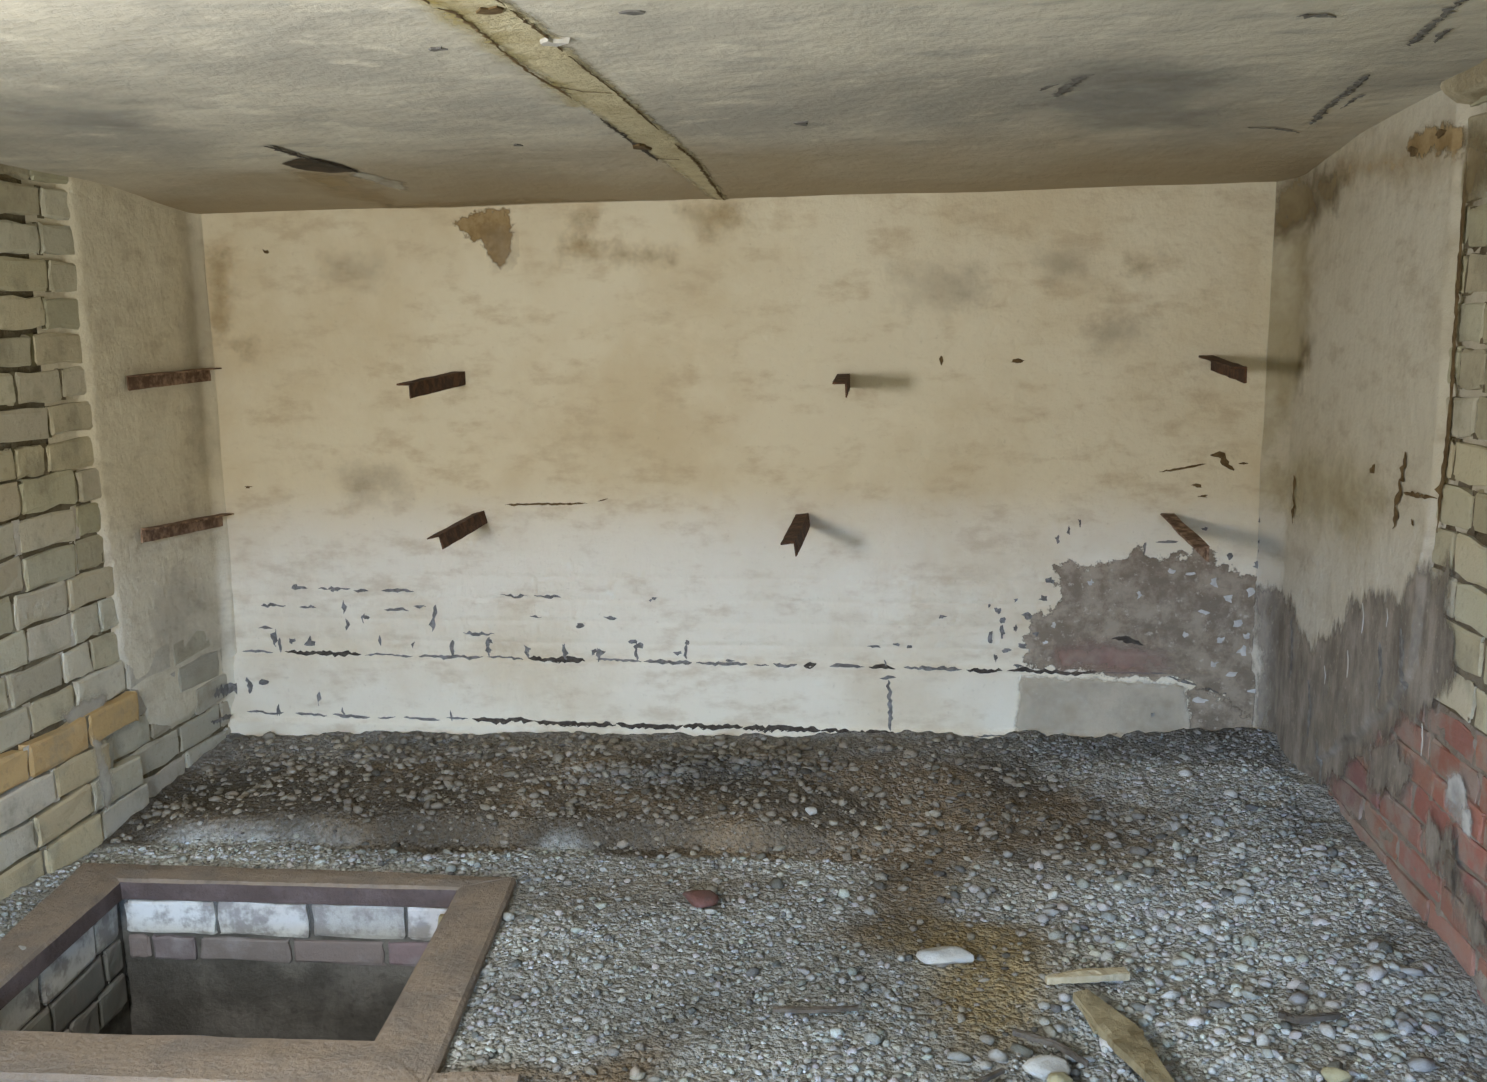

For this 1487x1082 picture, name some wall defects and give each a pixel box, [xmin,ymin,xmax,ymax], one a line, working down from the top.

spalling [264,146,405,189]
peeling [454,207,513,268]
crack [423,0,725,200]
peeling [988,540,1258,738]
water stain [1186,556,1456,786]